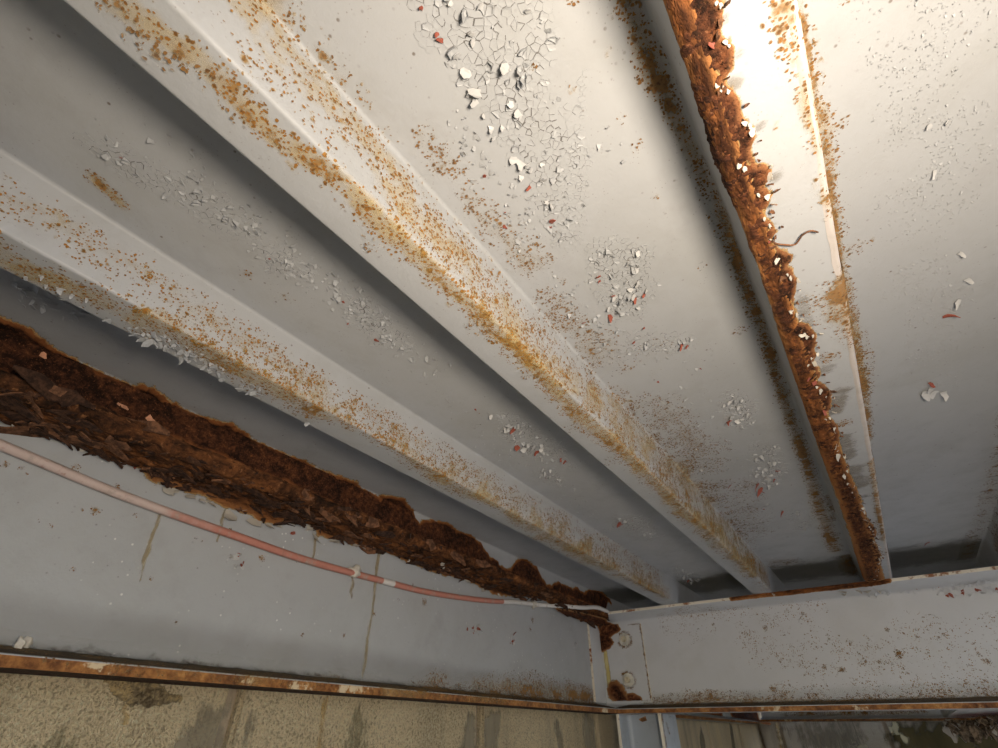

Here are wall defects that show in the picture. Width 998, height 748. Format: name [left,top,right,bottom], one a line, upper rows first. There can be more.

rust [0,0,892,631]
leakage [174,707,229,748]
rust [0,316,998,747]
leakage [889,721,908,743]